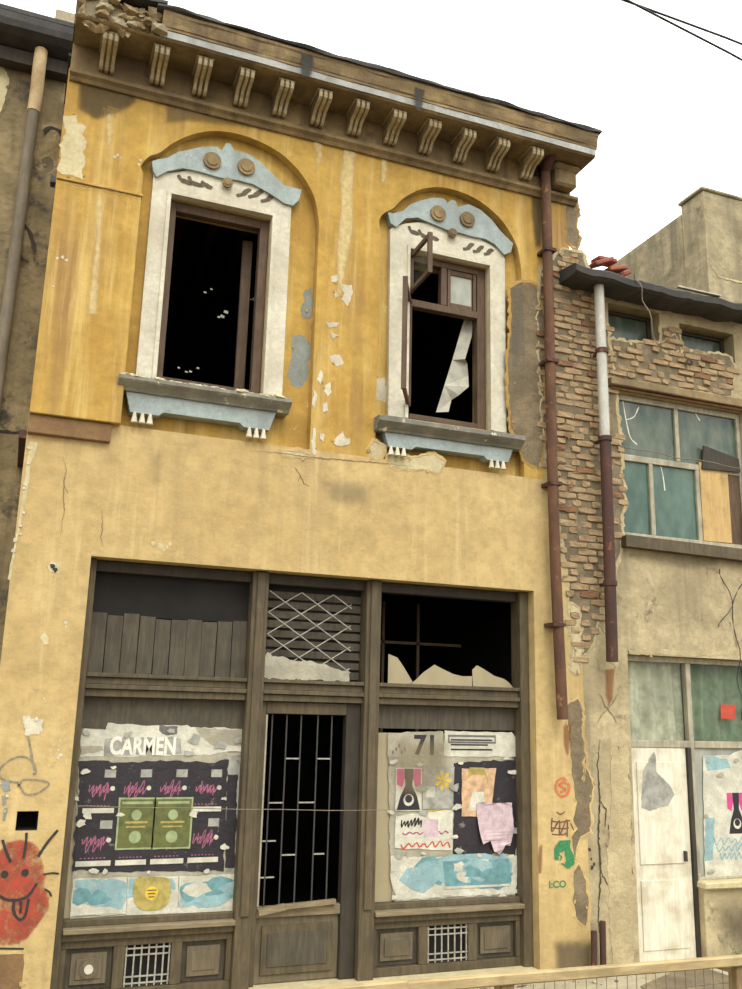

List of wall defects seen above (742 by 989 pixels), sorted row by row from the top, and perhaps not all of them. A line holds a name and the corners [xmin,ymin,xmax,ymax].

spalling [78,0,131,38]
peeling [39,113,87,180]
peeling [300,287,313,320]
peeling [331,275,353,306]
peeling [287,334,332,412]
peeling [329,355,344,367]
spalling [278,428,350,461]
spalling [365,438,447,476]
spalling [505,201,742,676]
spalling [8,441,38,580]